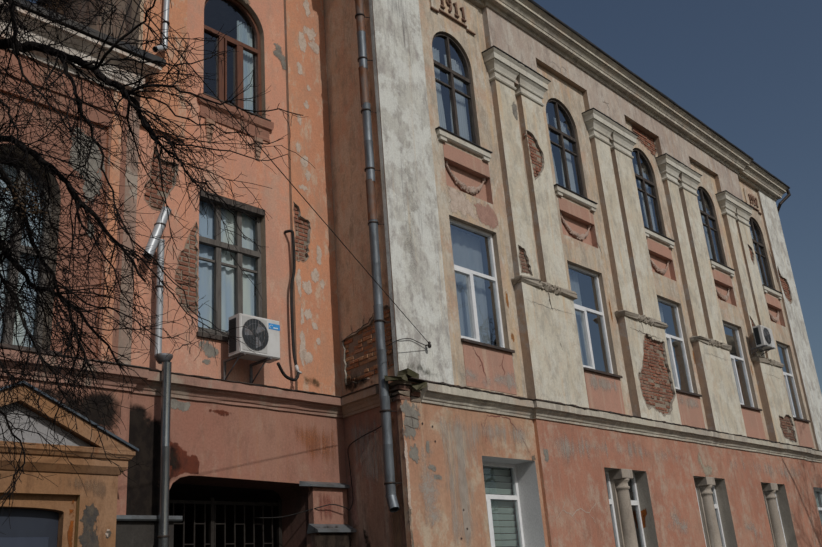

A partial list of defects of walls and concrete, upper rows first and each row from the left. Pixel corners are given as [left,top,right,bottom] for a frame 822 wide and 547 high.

spalling [523,129,544,180]
spalling [175,221,200,315]
peeling [293,201,325,366]
spalling [518,245,533,276]
spalling [342,304,394,383]
spalling [638,333,676,417]
spalling [779,414,797,443]
flaking render [78,504,111,547]